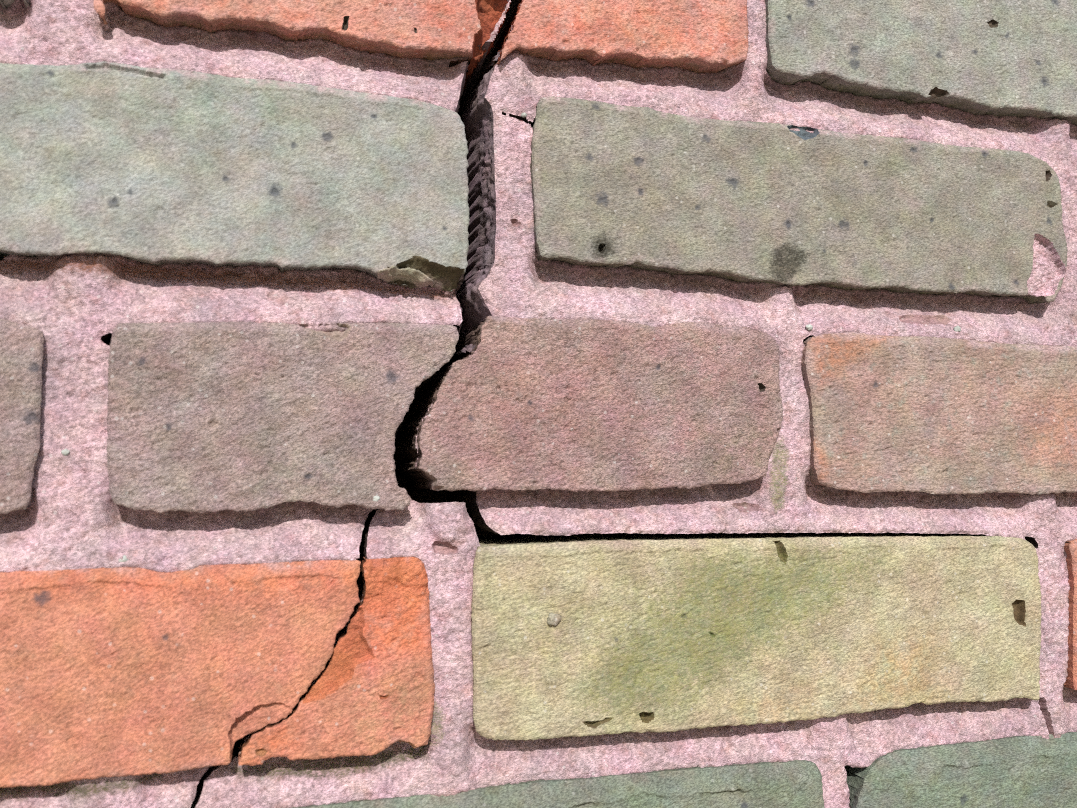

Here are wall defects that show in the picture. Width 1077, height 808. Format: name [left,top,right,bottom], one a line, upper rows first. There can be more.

spalling [377,256,465,292]
crack [393,0,555,536]
spalling [1026,233,1067,297]
crack [195,509,379,807]